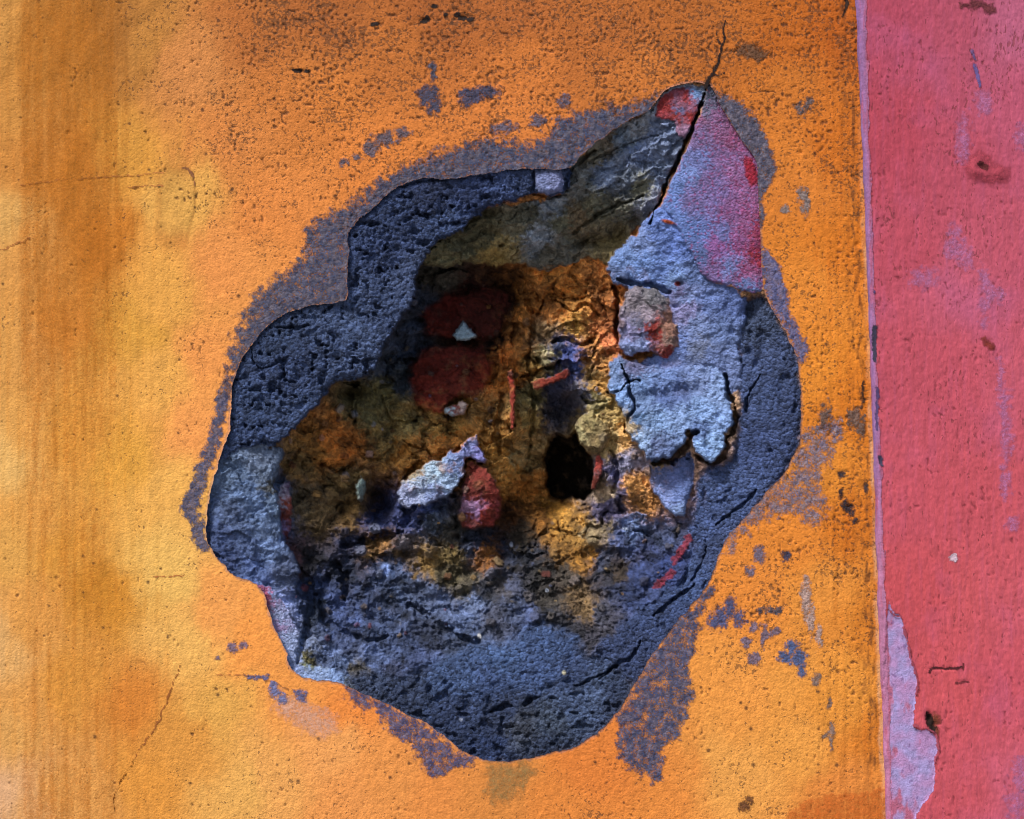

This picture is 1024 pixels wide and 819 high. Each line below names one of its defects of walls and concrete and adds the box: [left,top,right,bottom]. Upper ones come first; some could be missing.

crack [704,20,726,89]
peeling [414,62,442,116]
peeling [794,97,814,119]
peeling [780,186,811,219]
spalling [206,82,801,762]
peeling [820,397,832,428]
peeling [846,0,940,819]
peeling [707,596,822,686]
peeling [823,722,835,750]